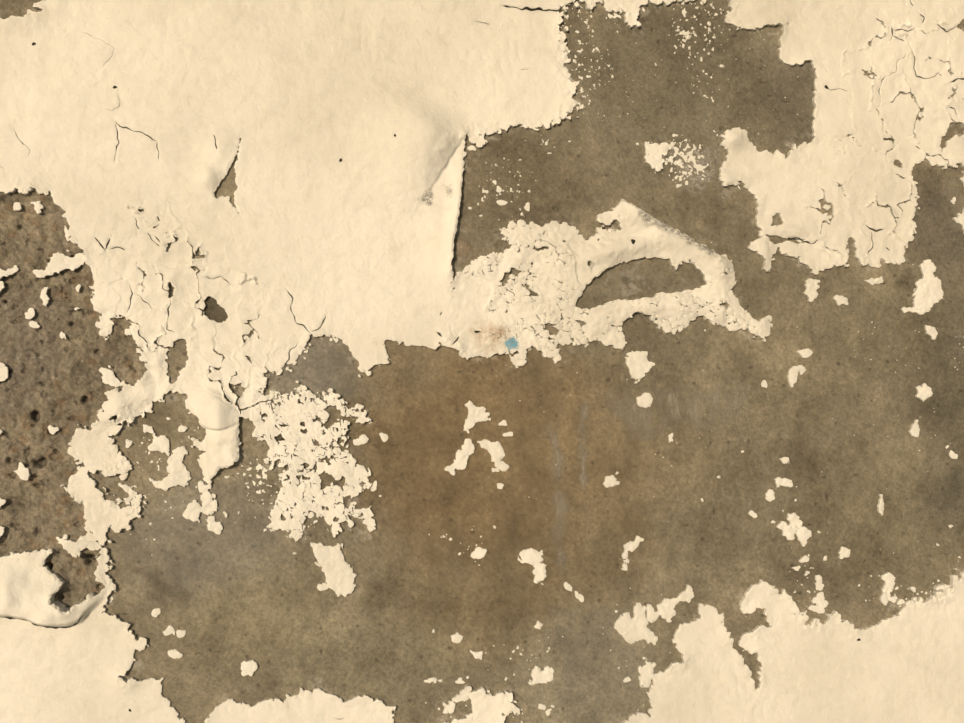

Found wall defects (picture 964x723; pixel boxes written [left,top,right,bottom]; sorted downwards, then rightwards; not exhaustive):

peeling [0,0,42,19]
crack [864,1,964,121]
crack [107,99,159,159]
crack [788,185,841,244]
crack [866,178,911,253]
spalling [0,189,171,608]
peeling [165,339,189,384]
crack [128,210,229,349]
peeling [200,296,228,323]
crack [209,291,360,530]
peeling [252,377,376,542]
spalling [430,199,773,368]